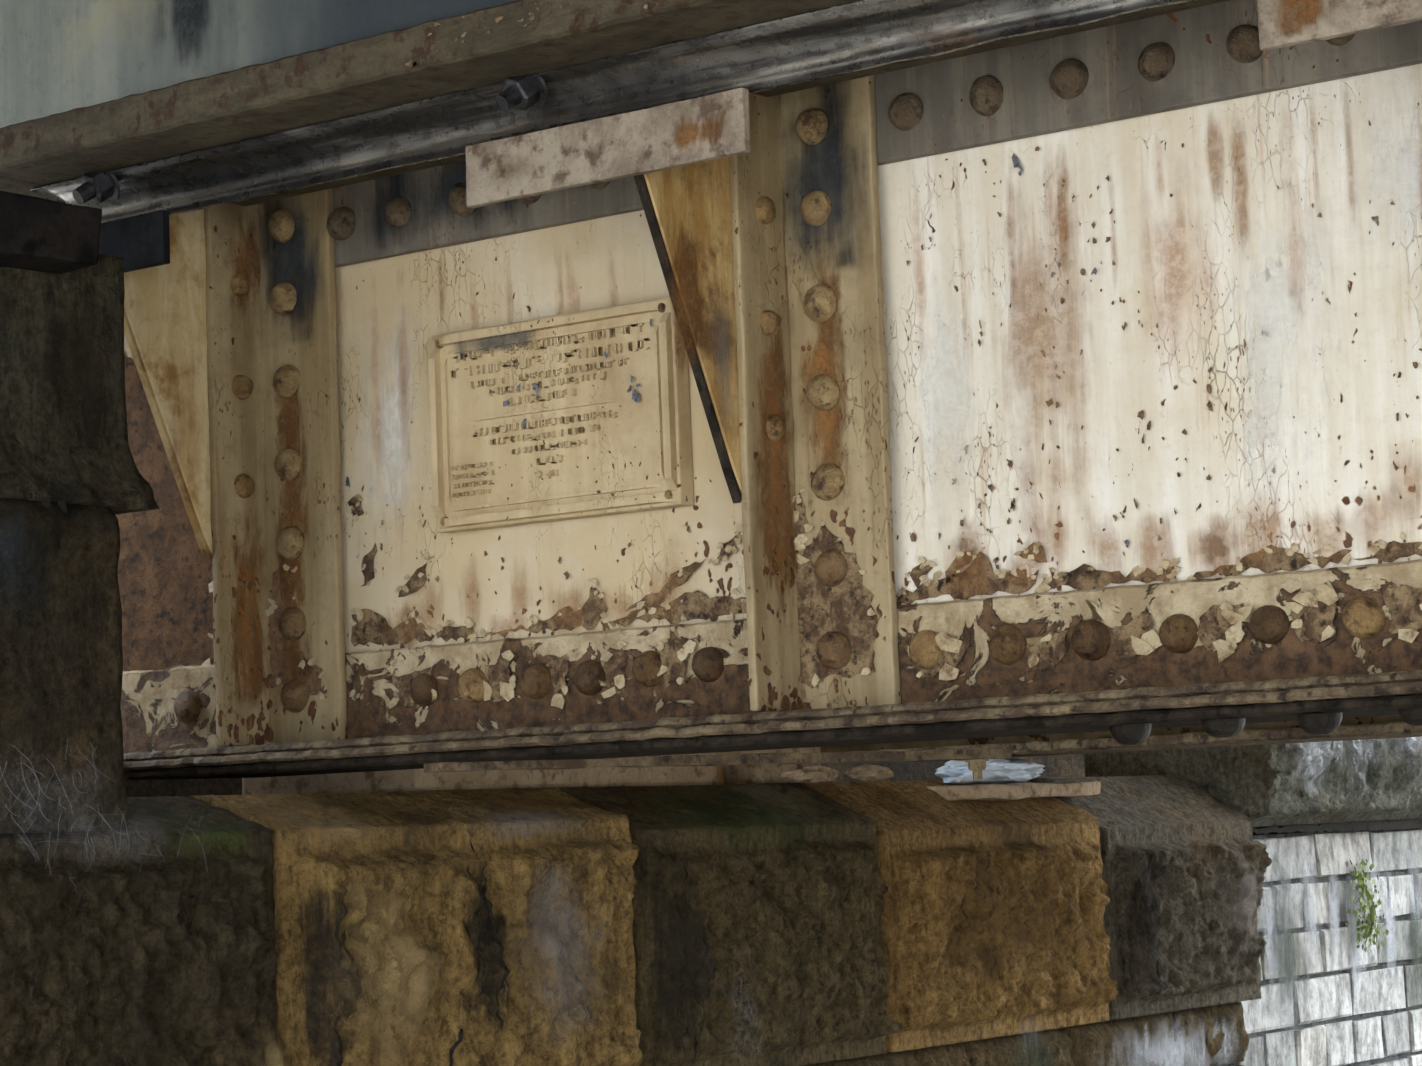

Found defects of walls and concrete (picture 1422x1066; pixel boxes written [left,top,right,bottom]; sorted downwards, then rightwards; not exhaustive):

damp [172,0,208,49]
corrosion [236,227,260,306]
corrosion [1057,182,1067,243]
corrosion [757,278,845,604]
corrosion [232,389,309,700]
peeling [345,476,378,587]
peeling [349,524,746,709]
peeling [791,487,878,689]
peeling [896,464,1422,644]
corrosion [1200,535,1226,562]
peeling [1197,601,1253,663]
crack [449,1029,463,1066]